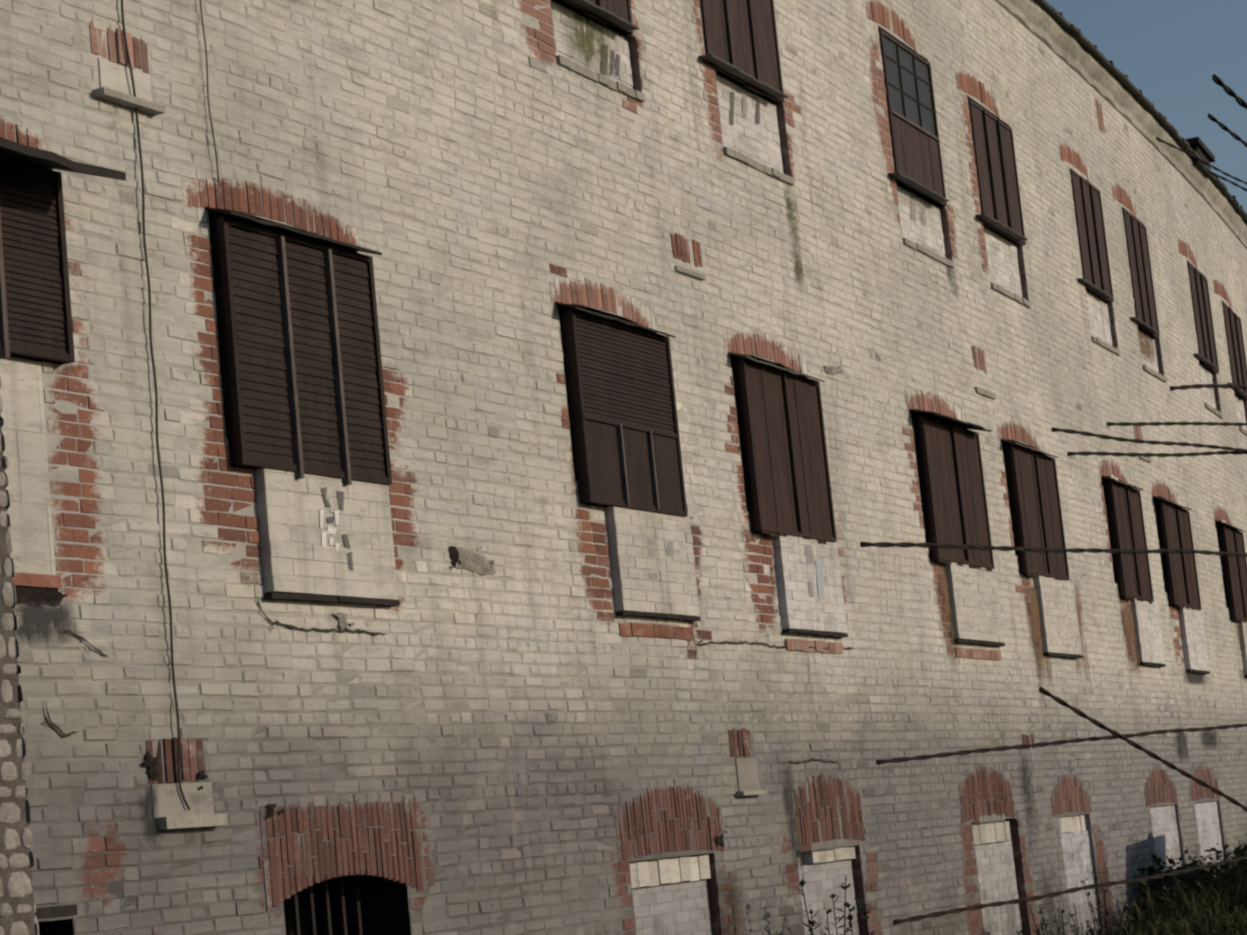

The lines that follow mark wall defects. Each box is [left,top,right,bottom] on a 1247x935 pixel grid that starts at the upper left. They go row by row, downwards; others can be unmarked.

peeling [513,0,568,85]
damp [788,192,804,280]
peeling [15,188,127,620]
peeling [171,209,265,598]
peeling [902,427,924,528]
damp [15,600,74,640]
peeling [923,554,964,664]